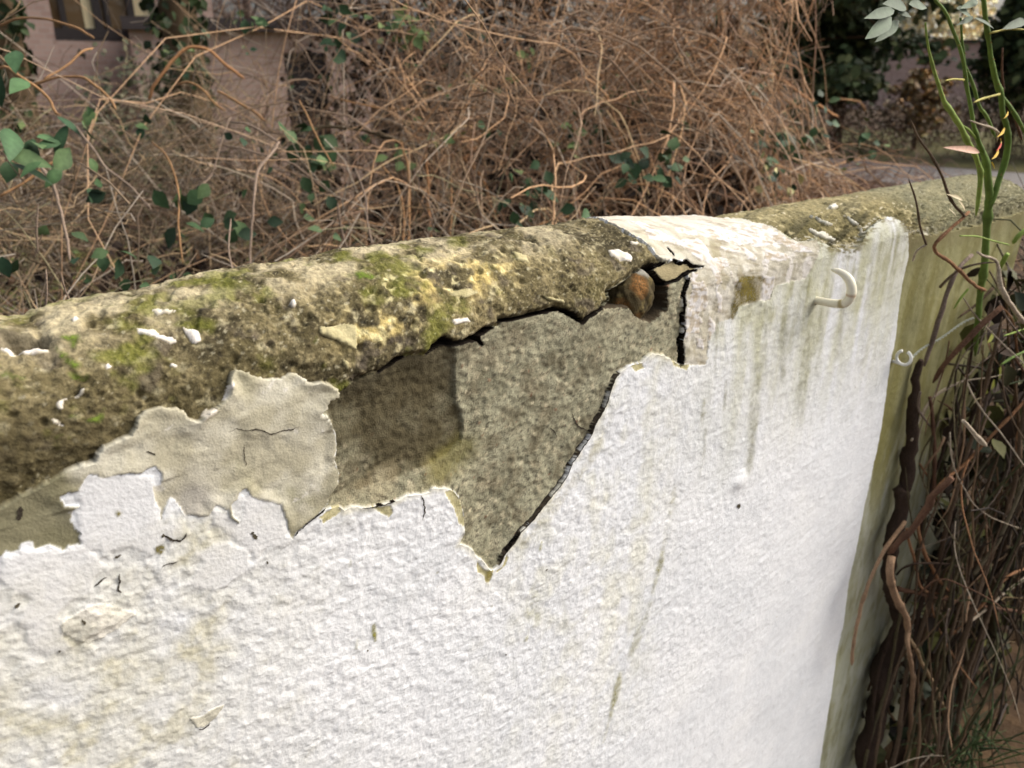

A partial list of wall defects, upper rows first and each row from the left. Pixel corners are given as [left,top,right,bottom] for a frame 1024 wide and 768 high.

spalling [0,203,868,583]
crack [378,306,603,373]
crack [501,375,619,563]
crack [640,248,703,365]